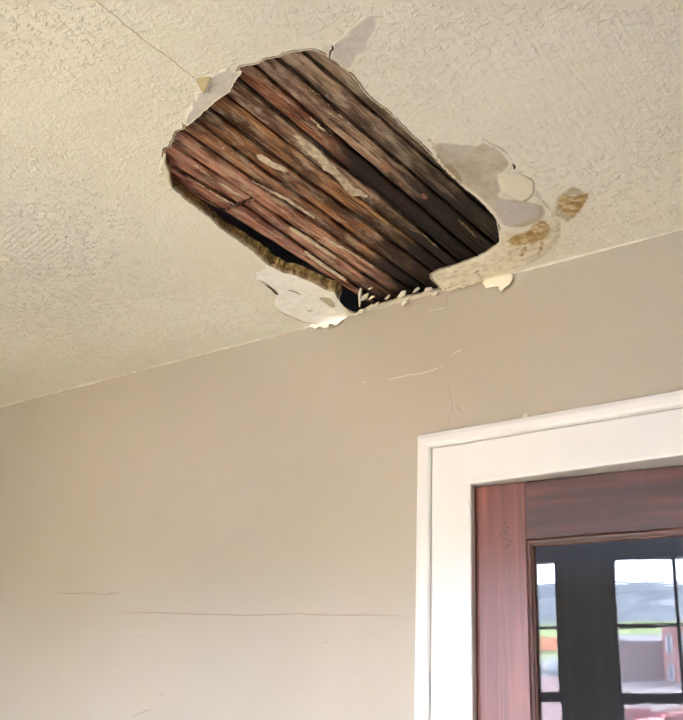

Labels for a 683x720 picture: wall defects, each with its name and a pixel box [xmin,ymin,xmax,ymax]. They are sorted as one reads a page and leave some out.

crack [95,0,194,78]
peeling [157,3,554,329]
crack [119,610,395,618]